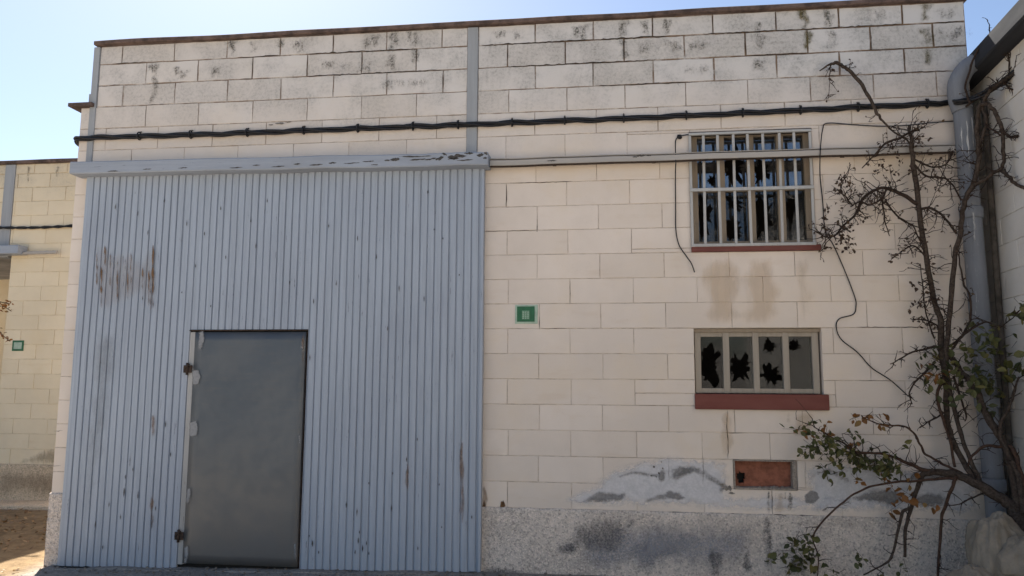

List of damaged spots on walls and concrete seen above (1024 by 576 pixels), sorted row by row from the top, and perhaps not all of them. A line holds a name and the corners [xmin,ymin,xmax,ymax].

rust [96,247,154,307]
spalling [719,471,745,494]